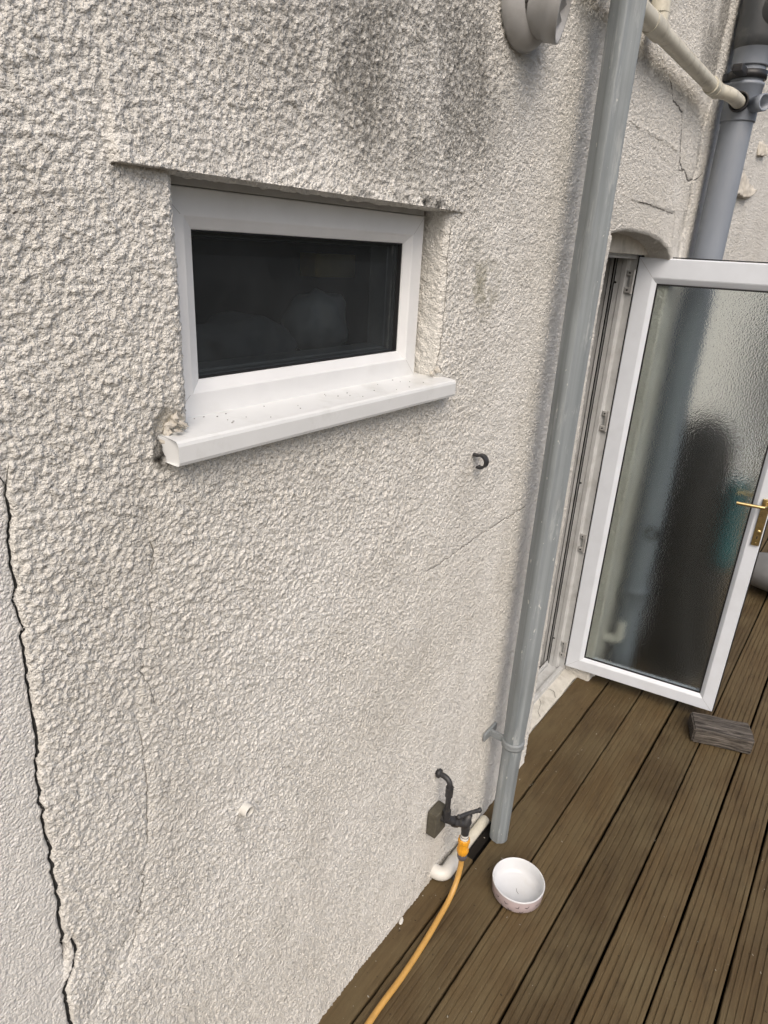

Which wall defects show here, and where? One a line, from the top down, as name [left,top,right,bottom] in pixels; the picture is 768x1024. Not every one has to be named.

crack [669,78,703,181]
flaking render [154,410,189,467]
crack [0,463,77,1024]